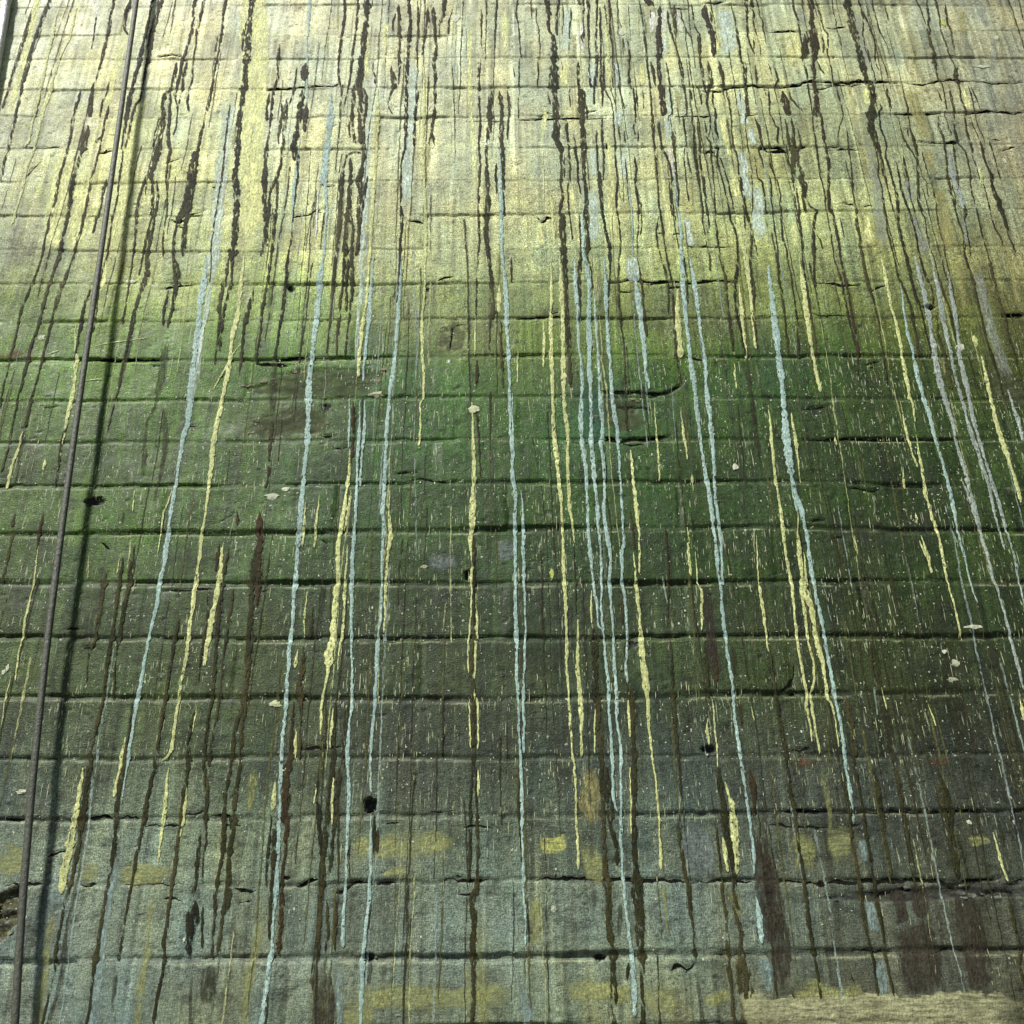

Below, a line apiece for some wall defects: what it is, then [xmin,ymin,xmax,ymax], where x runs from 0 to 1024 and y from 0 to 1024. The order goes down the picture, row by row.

crack [0,0,111,438]
water stain [181,0,227,256]
water stain [237,0,309,256]
crack [44,0,508,1024]
water stain [326,0,372,360]
water stain [544,0,560,63]
water stain [558,256,602,629]
water stain [639,185,724,585]
crack [511,0,1024,1024]
water stain [780,91,808,212]
water stain [881,256,916,422]
crack [0,578,41,822]